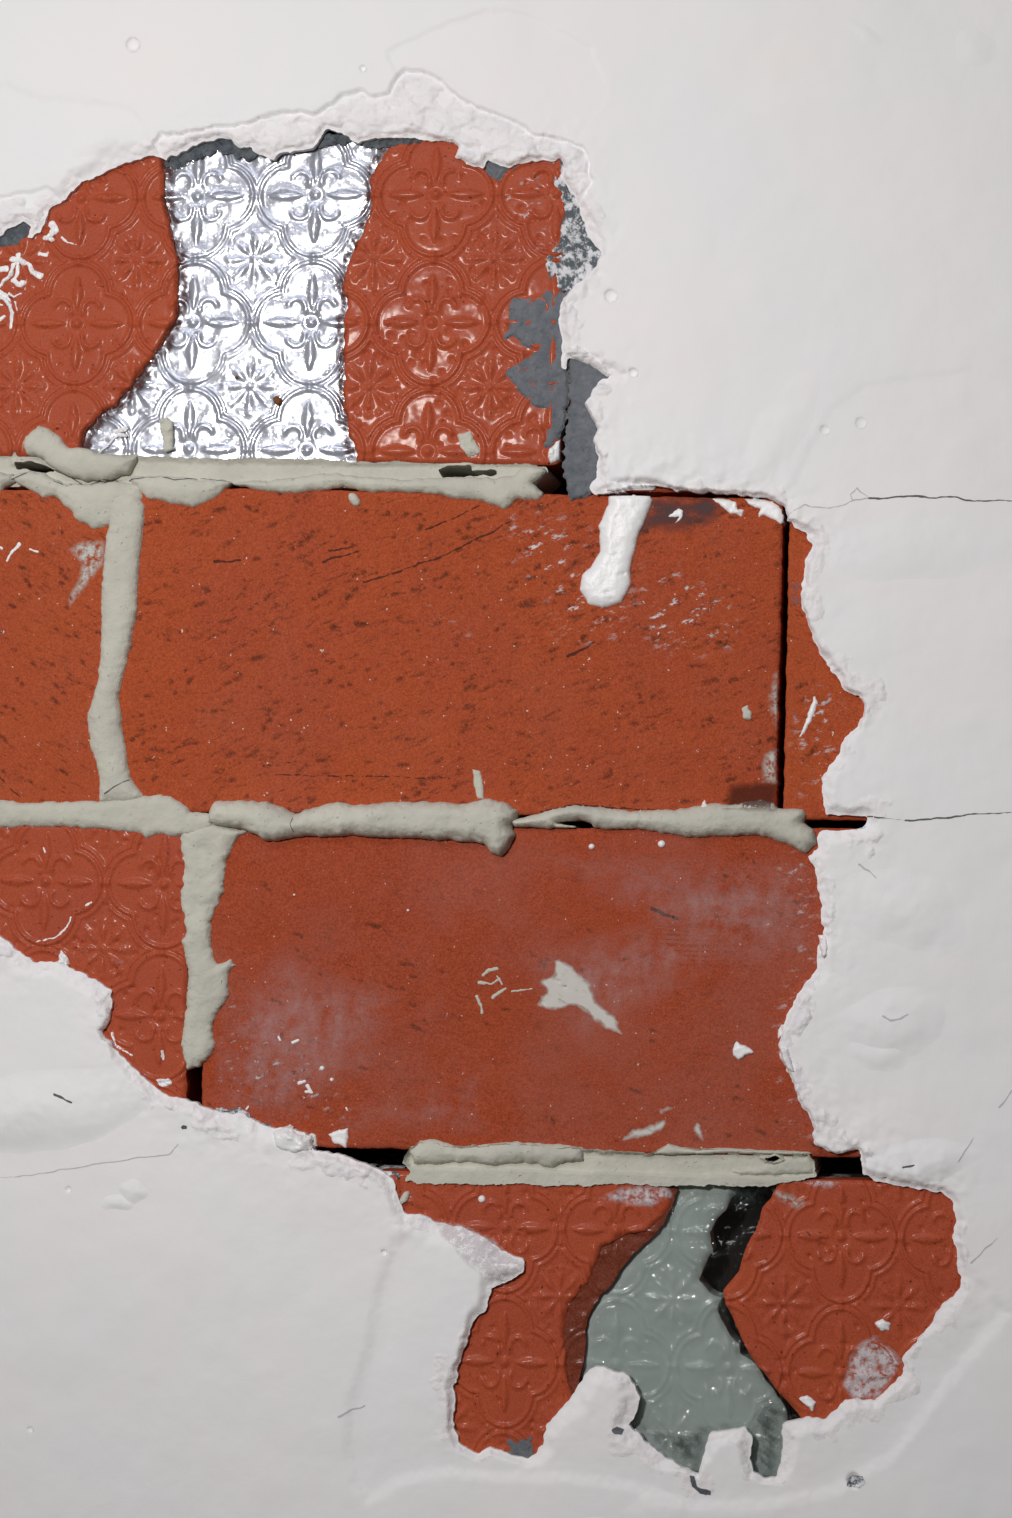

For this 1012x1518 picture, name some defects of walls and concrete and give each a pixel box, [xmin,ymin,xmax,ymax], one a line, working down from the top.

peeling [0,72,948,1197]
crack [788,487,1011,515]
crack [858,812,1012,878]
spalling [0,937,524,1463]
spalling [606,1207,979,1498]